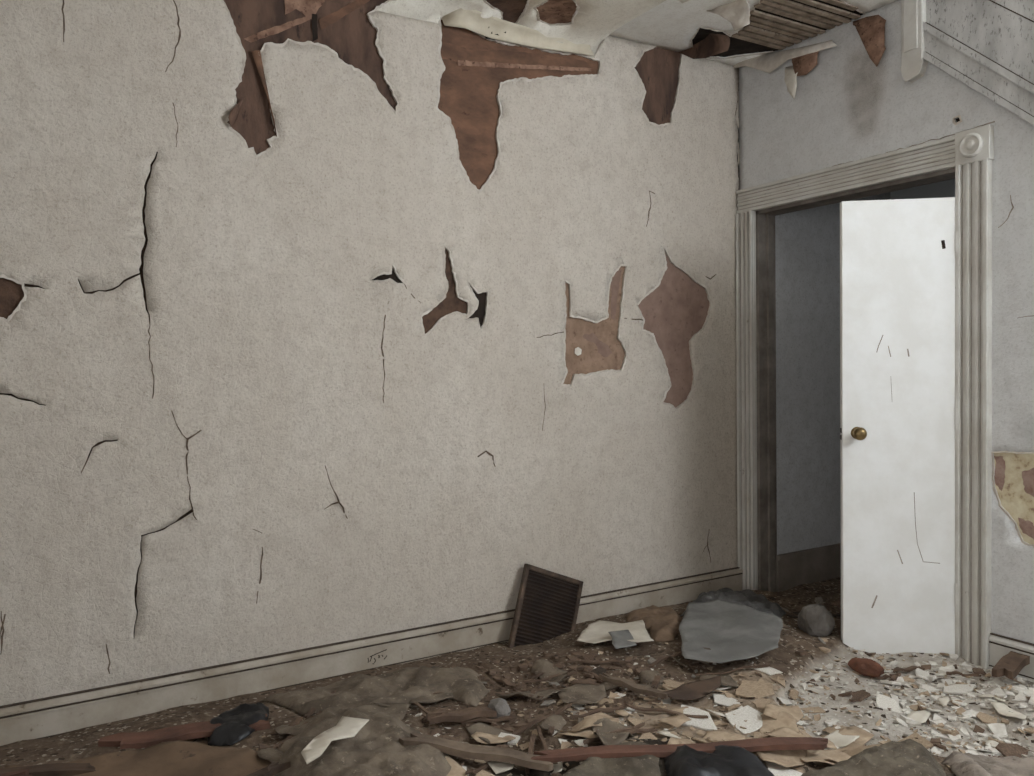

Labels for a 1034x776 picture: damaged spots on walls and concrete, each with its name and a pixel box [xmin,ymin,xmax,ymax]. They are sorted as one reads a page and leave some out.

crack [165,0,181,72]
peeling [221,0,399,158]
peeling [436,0,601,193]
peeling [633,46,683,127]
spalling [0,274,27,322]
crack [0,393,46,406]
crack [78,103,202,633]
spalling [421,244,489,336]
peeling [561,264,627,387]
peeling [637,245,712,410]
crack [325,466,347,518]
peeling [992,451,1034,547]